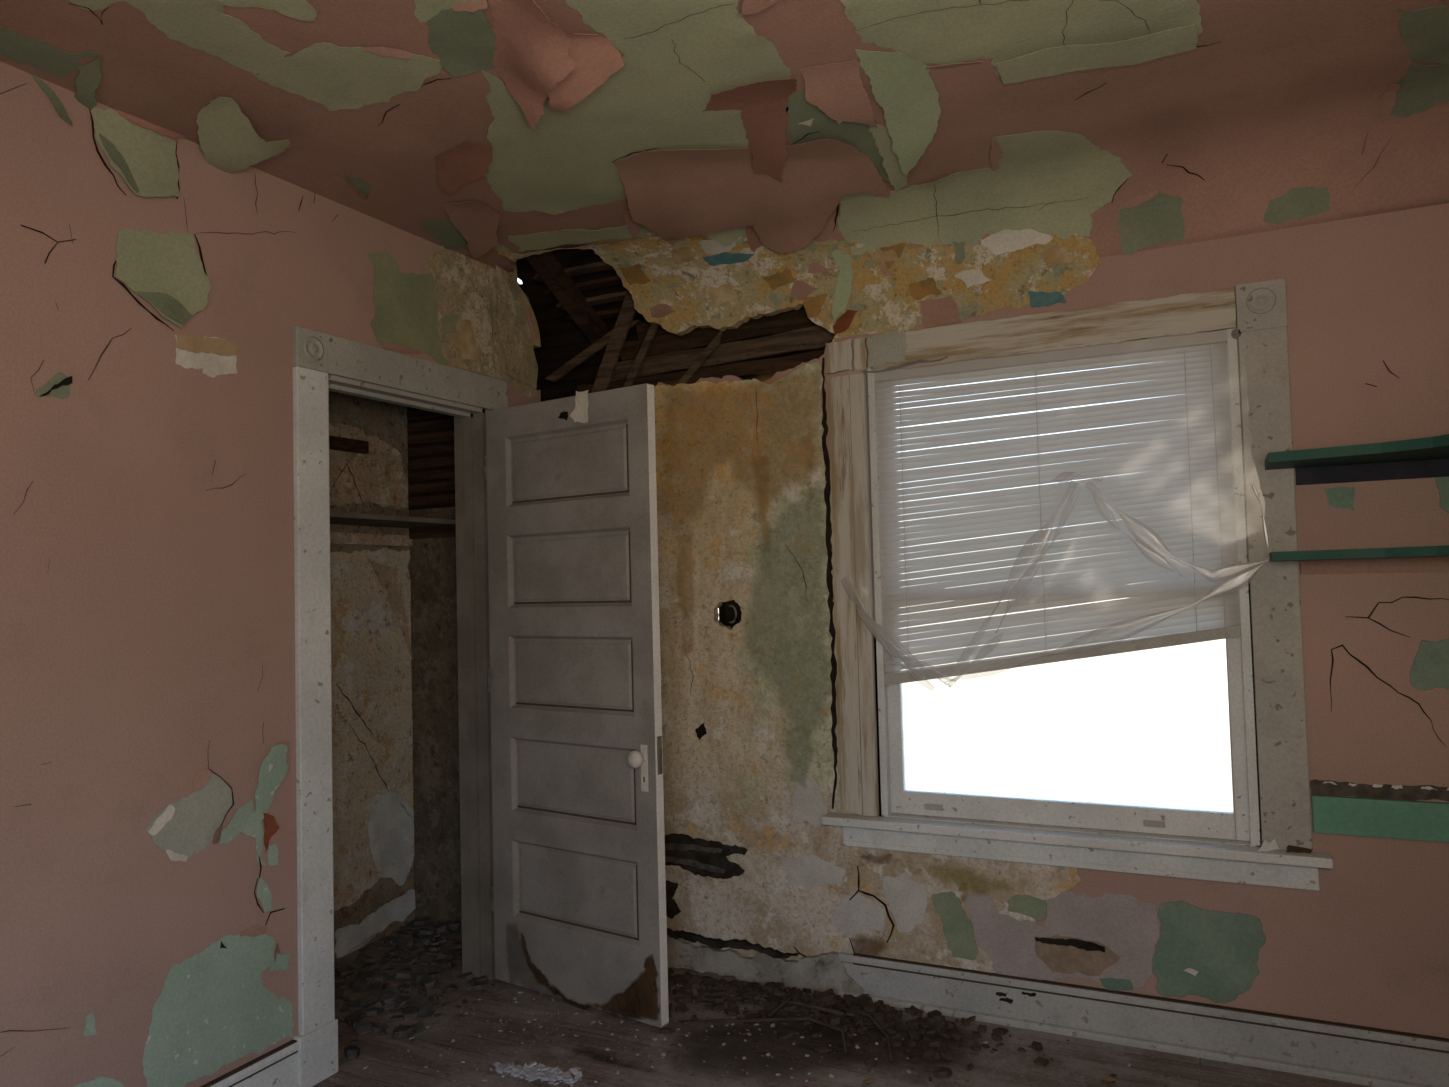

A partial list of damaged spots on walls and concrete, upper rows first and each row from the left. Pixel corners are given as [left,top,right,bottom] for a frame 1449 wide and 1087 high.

peeling [0,25,290,197]
crack [21,224,76,264]
peeling [70,0,1203,398]
flaking render [654,361,1266,1004]
crack [1330,596,1449,745]
peeling [1410,639,1449,690]
peeling [142,744,294,1087]